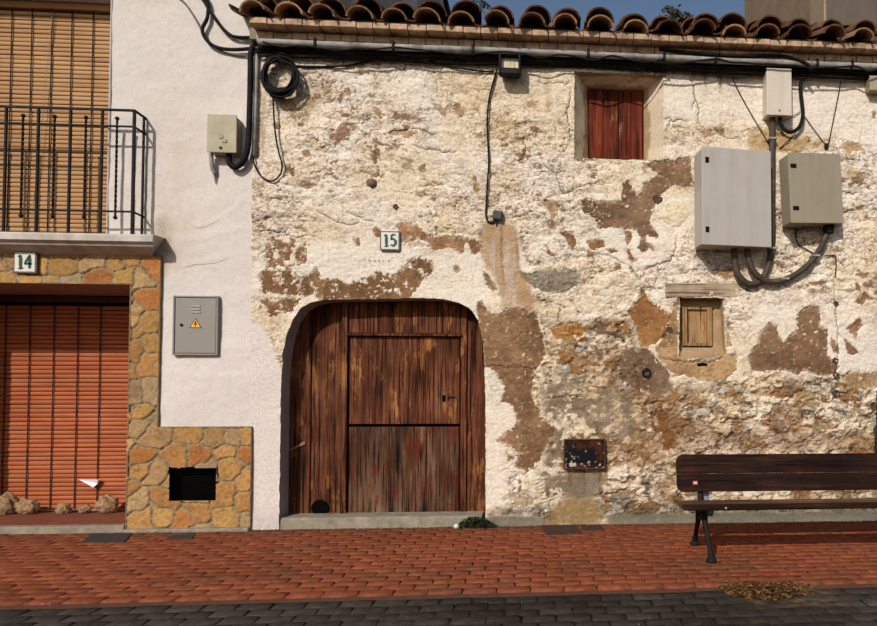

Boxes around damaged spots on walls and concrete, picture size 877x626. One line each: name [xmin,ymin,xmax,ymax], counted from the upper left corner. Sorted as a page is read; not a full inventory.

flaking render [542,157,694,264]
flaking render [259,223,483,317]
flaking render [477,301,613,472]
flaking render [617,288,877,399]
flaking render [855,282,873,305]